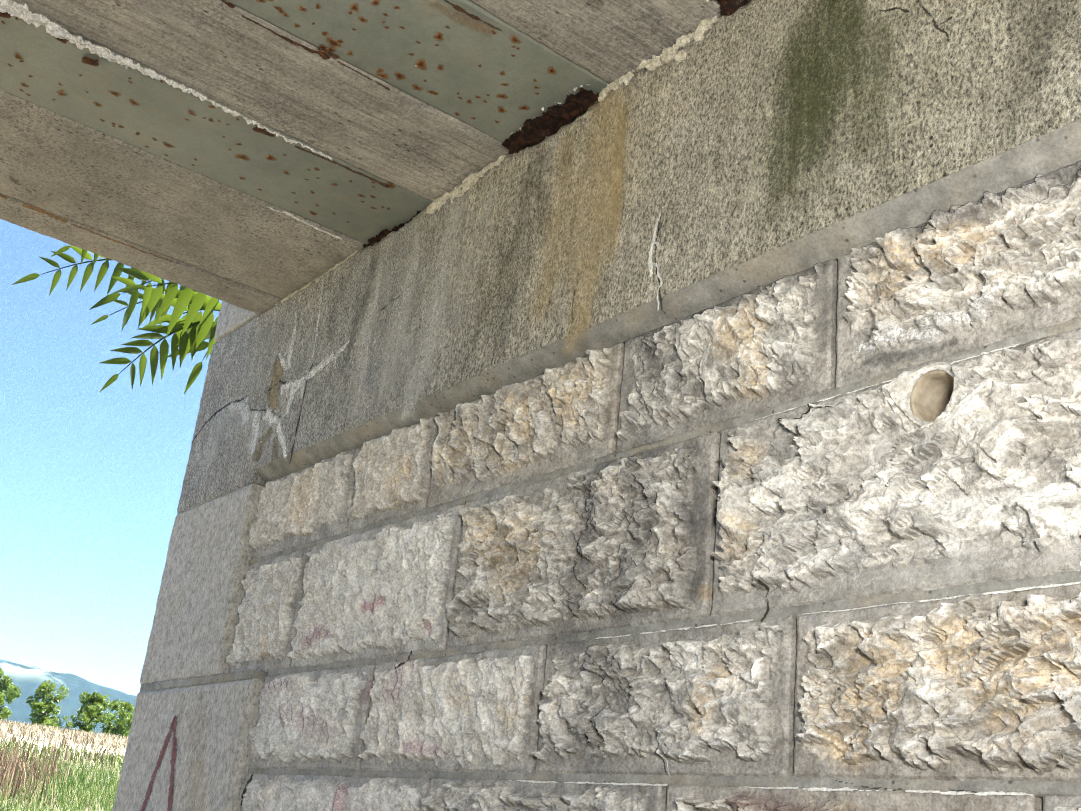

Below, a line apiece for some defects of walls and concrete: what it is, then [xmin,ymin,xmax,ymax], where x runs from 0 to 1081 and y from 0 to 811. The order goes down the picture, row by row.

rust [79,57,99,76]
water stain [0,0,332,161]
rust [221,0,443,95]
rust [444,0,520,57]
rust [457,71,508,123]
crack [881,0,952,42]
rust [266,146,395,215]
rust [23,204,173,262]
water stain [267,206,343,240]
rust [363,211,421,248]
crack [647,213,666,314]
crack [191,364,313,464]